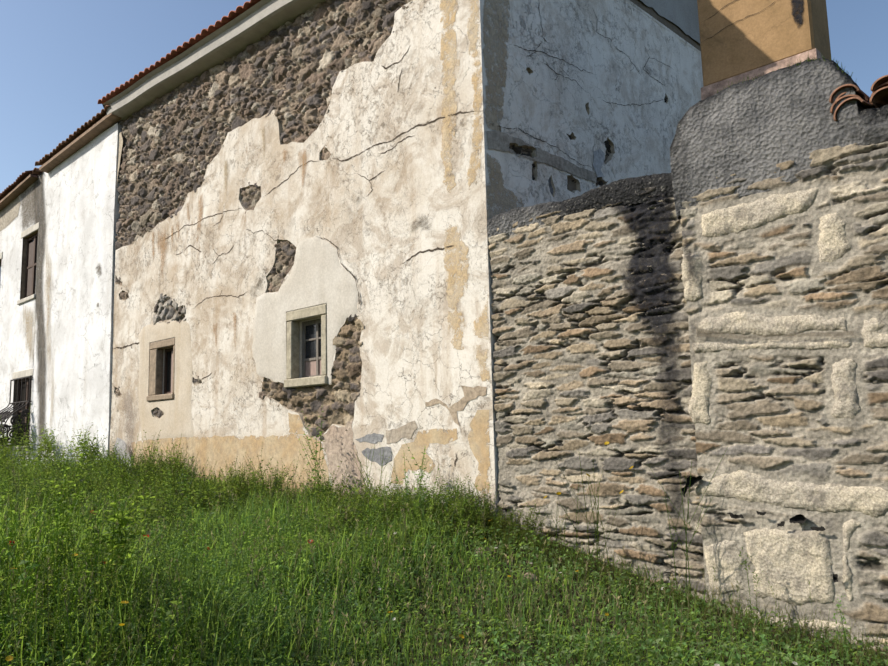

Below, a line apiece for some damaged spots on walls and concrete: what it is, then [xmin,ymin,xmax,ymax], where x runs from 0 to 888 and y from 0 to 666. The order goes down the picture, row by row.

leakage [791,0,804,27]
flaking render [115,0,412,251]
crack [263,111,472,197]
peeling [467,0,615,220]
crack [498,126,592,168]
crack [159,209,236,263]
crack [316,236,360,304]
crack [402,245,454,264]
leakage [612,191,693,465]
peeling [114,227,490,499]
peeling [681,475,704,497]
peeling [777,514,826,531]